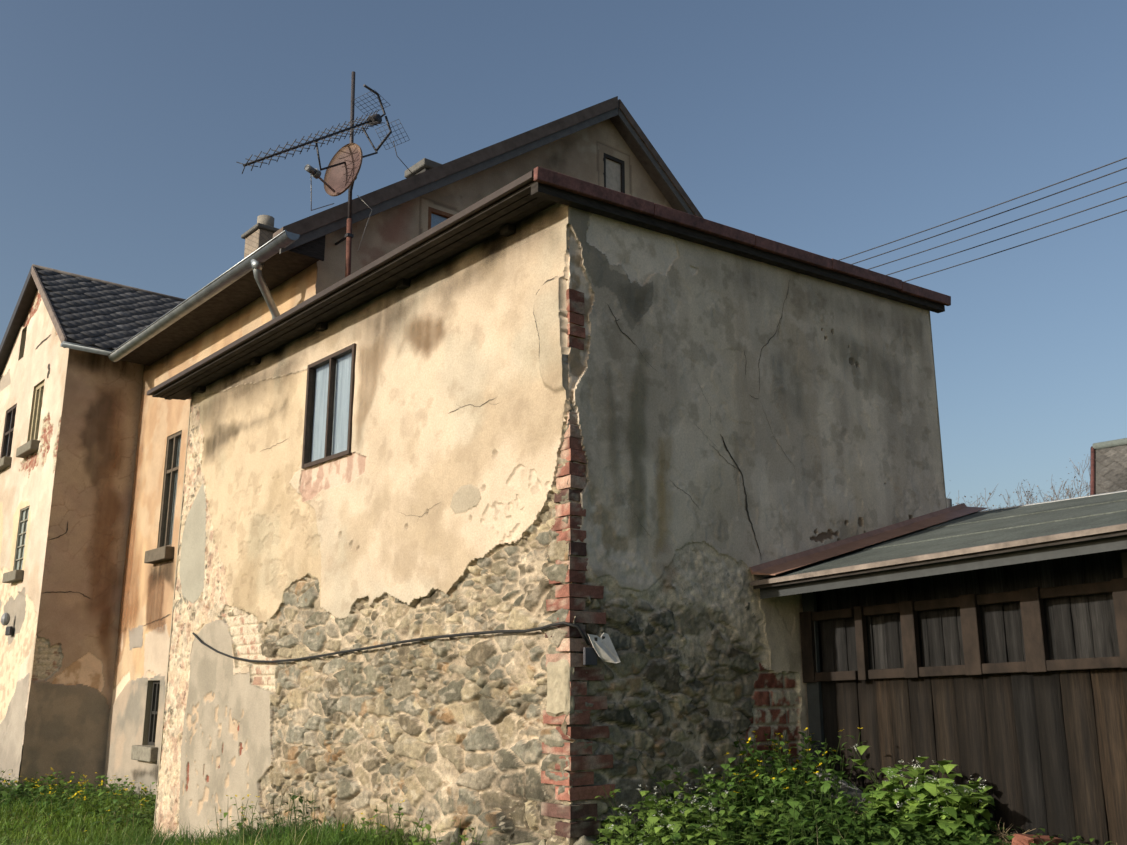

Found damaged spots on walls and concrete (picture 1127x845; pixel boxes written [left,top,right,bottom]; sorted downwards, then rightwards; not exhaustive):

spalling [22,290,42,329]
spalling [18,411,61,478]
spalling [146,214,804,845]
crack [695,385,762,559]
flaking render [0,566,131,723]